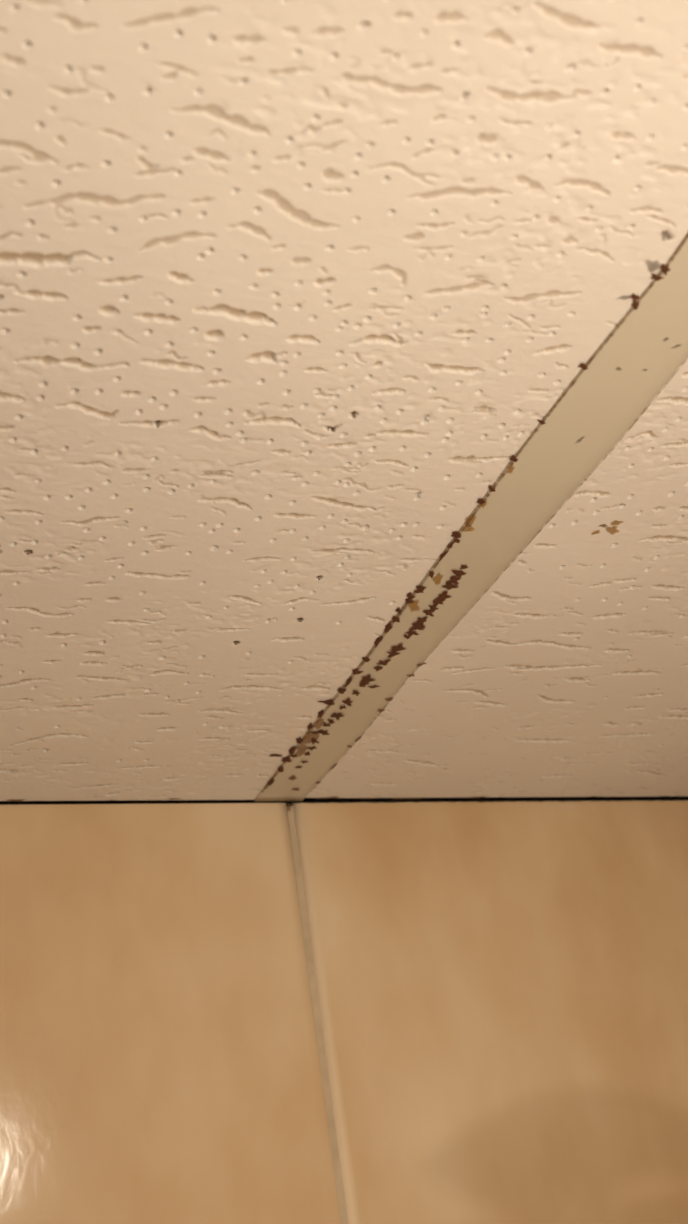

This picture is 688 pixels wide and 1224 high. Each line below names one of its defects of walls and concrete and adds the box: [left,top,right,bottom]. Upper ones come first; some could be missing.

rust [262,235,688,792]